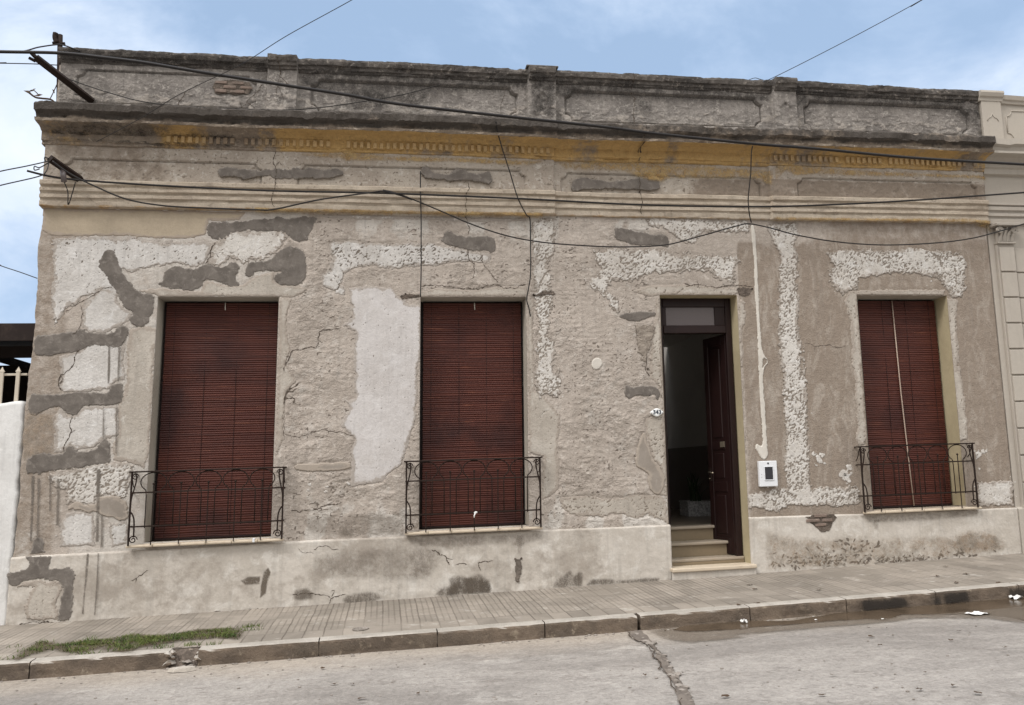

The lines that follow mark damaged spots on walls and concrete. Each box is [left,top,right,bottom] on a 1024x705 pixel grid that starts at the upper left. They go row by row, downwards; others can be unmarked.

crack [283,328,352,438]
peeling [771,514,996,571]